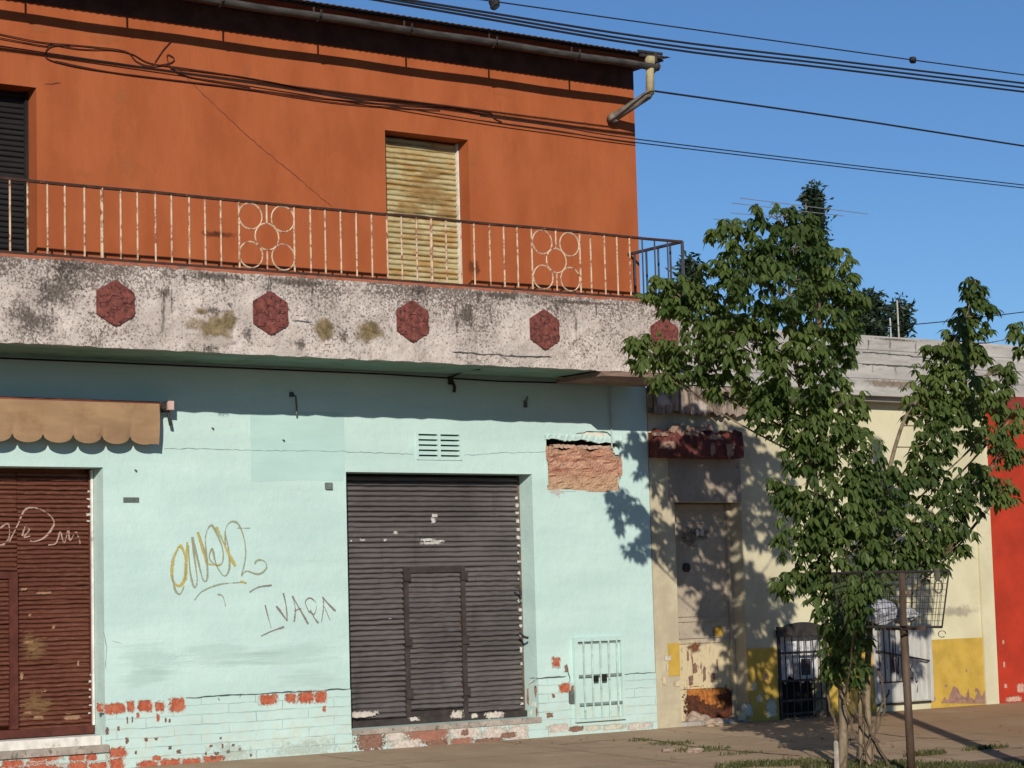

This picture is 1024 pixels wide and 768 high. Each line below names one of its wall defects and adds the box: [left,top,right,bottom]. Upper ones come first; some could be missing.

damp [4,258,95,335]
damp [183,272,252,286]
damp [267,278,322,295]
damp [187,303,251,355]
damp [315,318,383,344]
spalling [544,431,623,492]
spalling [652,423,735,459]
peeling [551,656,574,698]
peeling [662,651,716,687]
peeling [0,674,252,768]
peeling [256,690,327,712]
peeling [352,680,653,751]